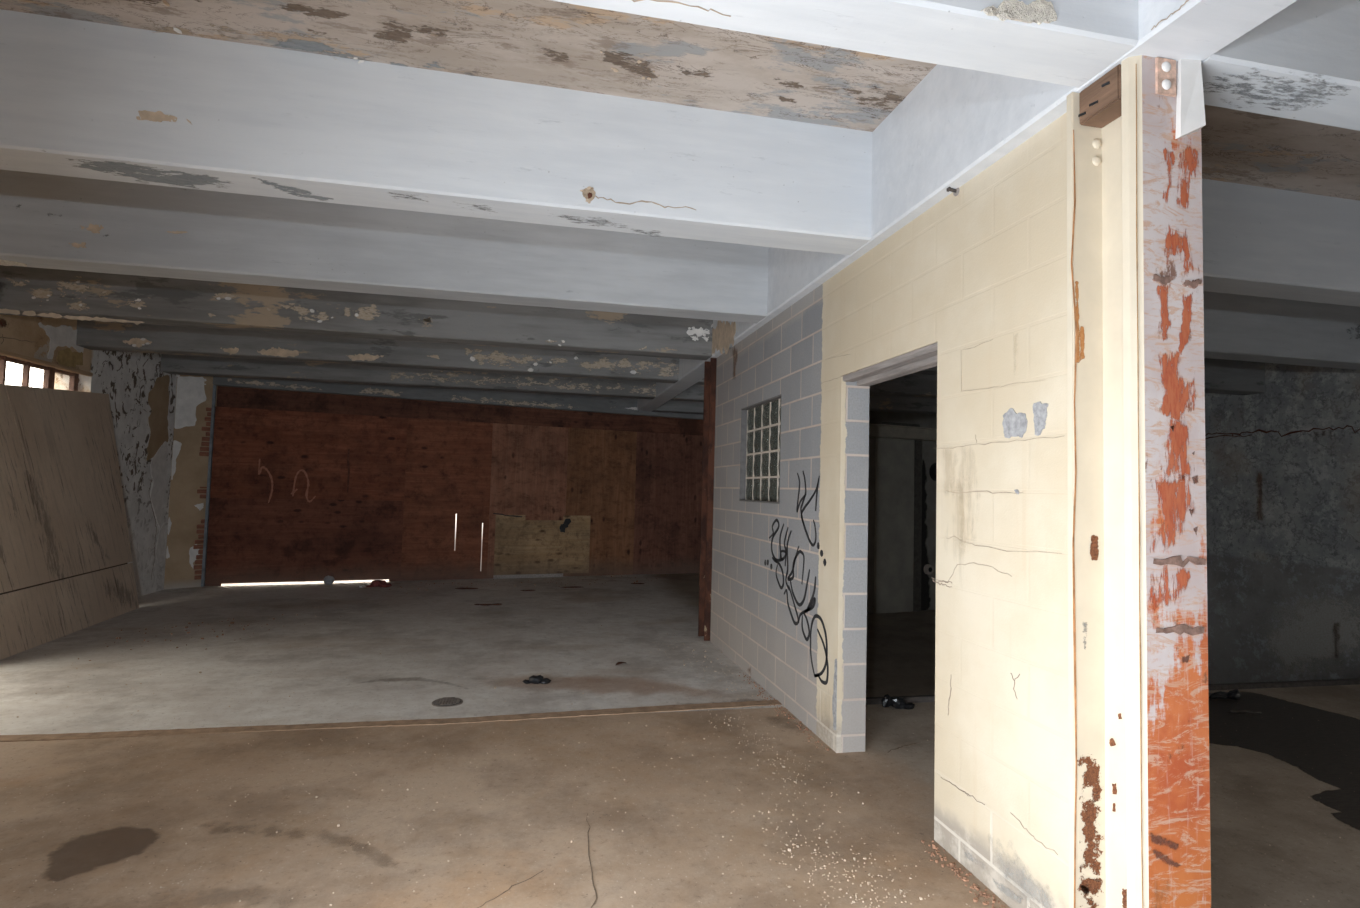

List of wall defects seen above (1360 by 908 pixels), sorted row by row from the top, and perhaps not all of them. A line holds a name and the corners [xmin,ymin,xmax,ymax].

crack [632,0,731,17]
spalling [981,0,1057,25]
peeling [136,110,191,123]
crack [595,195,696,210]
peeling [266,303,381,323]
peeling [257,347,299,357]
peeling [346,353,384,361]
crack [1205,425,1360,439]
damp [1209,692,1360,830]
corrosion [1077,756,1117,908]
crack [586,813,597,908]
crack [478,870,544,908]